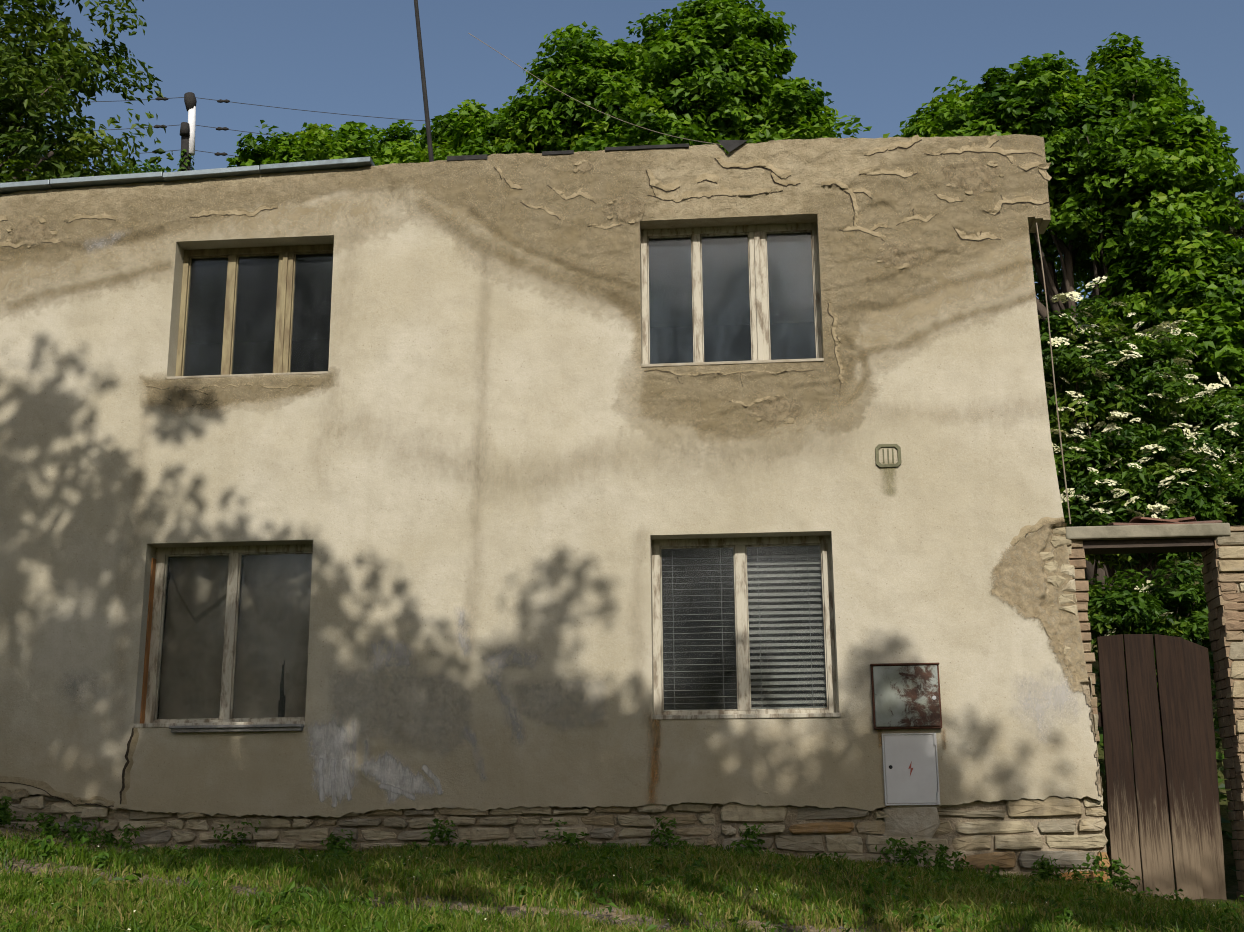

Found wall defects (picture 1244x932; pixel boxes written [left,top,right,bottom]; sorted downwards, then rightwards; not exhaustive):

spalling [941,155,1009,197]
spalling [747,394,802,427]
spalling [990,519,1103,797]
crack [0,728,139,808]